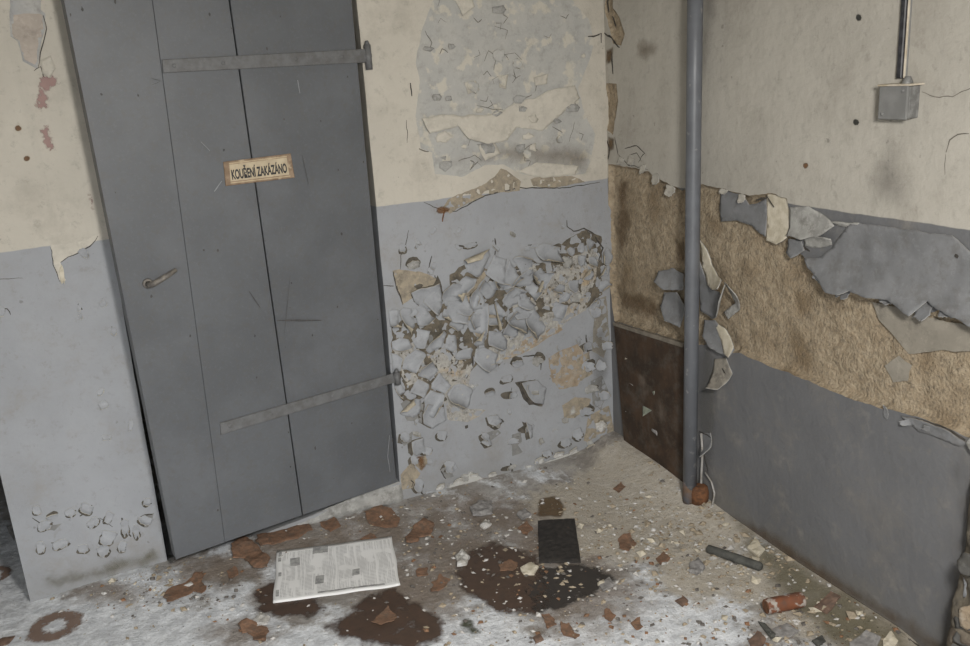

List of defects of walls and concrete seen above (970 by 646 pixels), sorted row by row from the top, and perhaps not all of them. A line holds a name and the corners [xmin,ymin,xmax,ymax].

flaking render [9,0,55,78]
peeling [50,233,100,284]
peeling [383,0,685,495]
flaking render [699,184,970,450]
peeling [32,498,154,558]